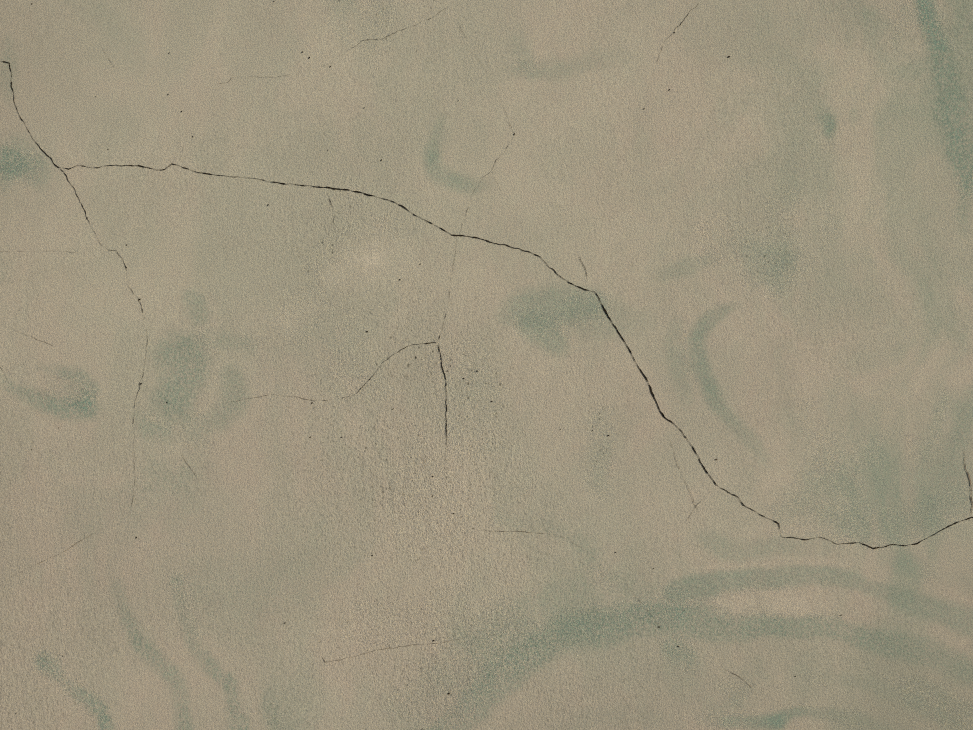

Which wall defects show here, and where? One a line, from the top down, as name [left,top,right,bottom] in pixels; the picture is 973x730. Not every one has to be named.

crack [2,61,973,549]